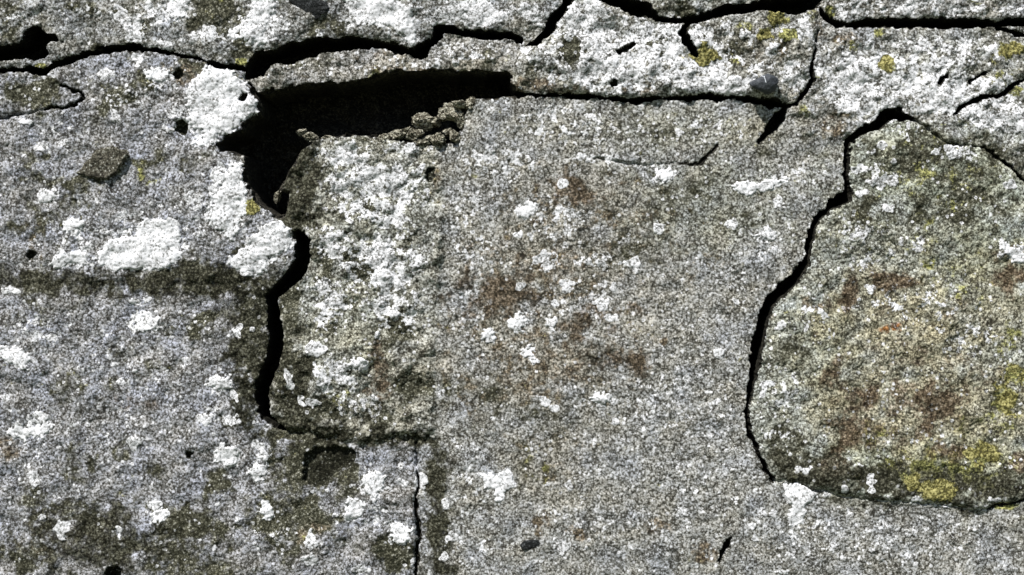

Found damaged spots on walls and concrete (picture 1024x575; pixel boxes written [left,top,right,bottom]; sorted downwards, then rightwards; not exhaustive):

crack [0,0,1024,116]
crack [515,48,817,145]
spalling [425,167,435,182]
crack [678,143,719,166]
crack [980,146,1024,182]
crack [254,229,312,431]
crack [743,106,915,483]
crack [986,498,1024,510]